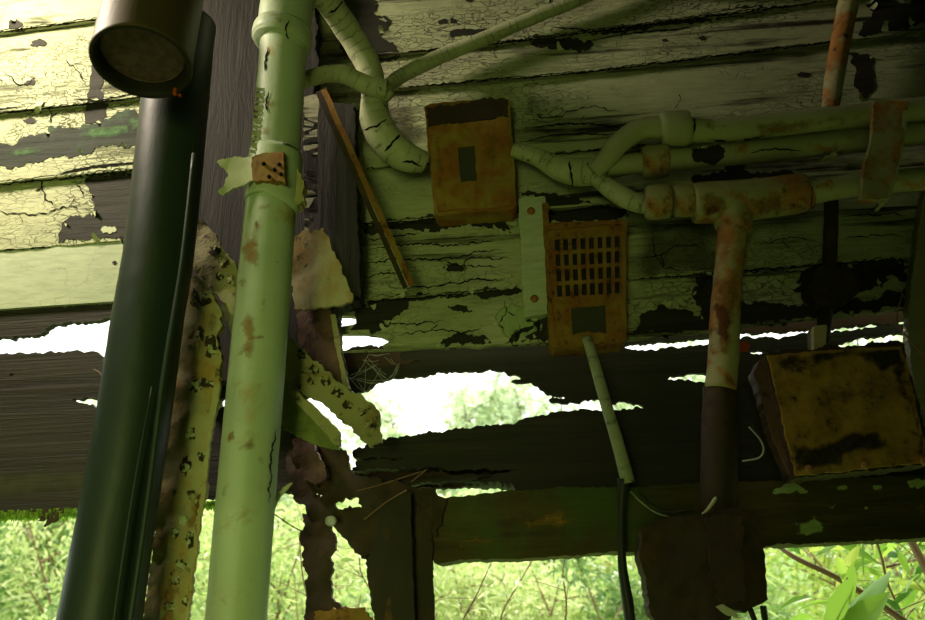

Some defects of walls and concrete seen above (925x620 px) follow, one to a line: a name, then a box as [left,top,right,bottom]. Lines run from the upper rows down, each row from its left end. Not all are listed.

peeling [344,0,400,62]
peeling [438,18,487,36]
peeling [0,55,139,169]
crack [0,60,140,123]
crack [0,162,133,221]
crack [3,244,49,252]
peeling [343,283,522,338]
crack [361,217,515,336]
peeling [633,270,713,339]
rust [715,283,737,351]
mould [858,349,908,399]
water stain [794,433,885,469]